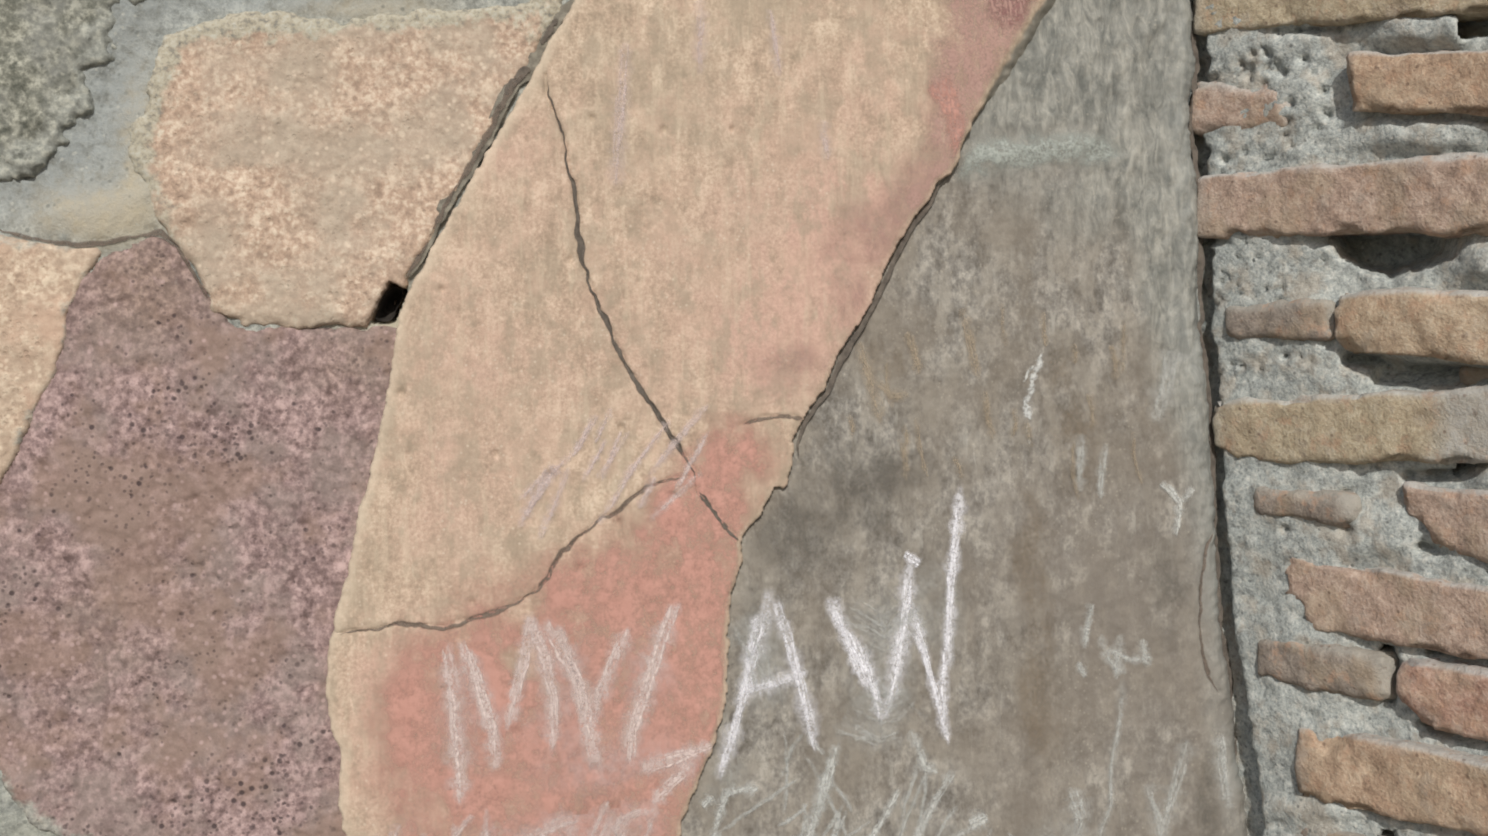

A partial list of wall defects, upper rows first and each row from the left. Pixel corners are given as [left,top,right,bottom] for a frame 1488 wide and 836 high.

crack [346,0,738,633]